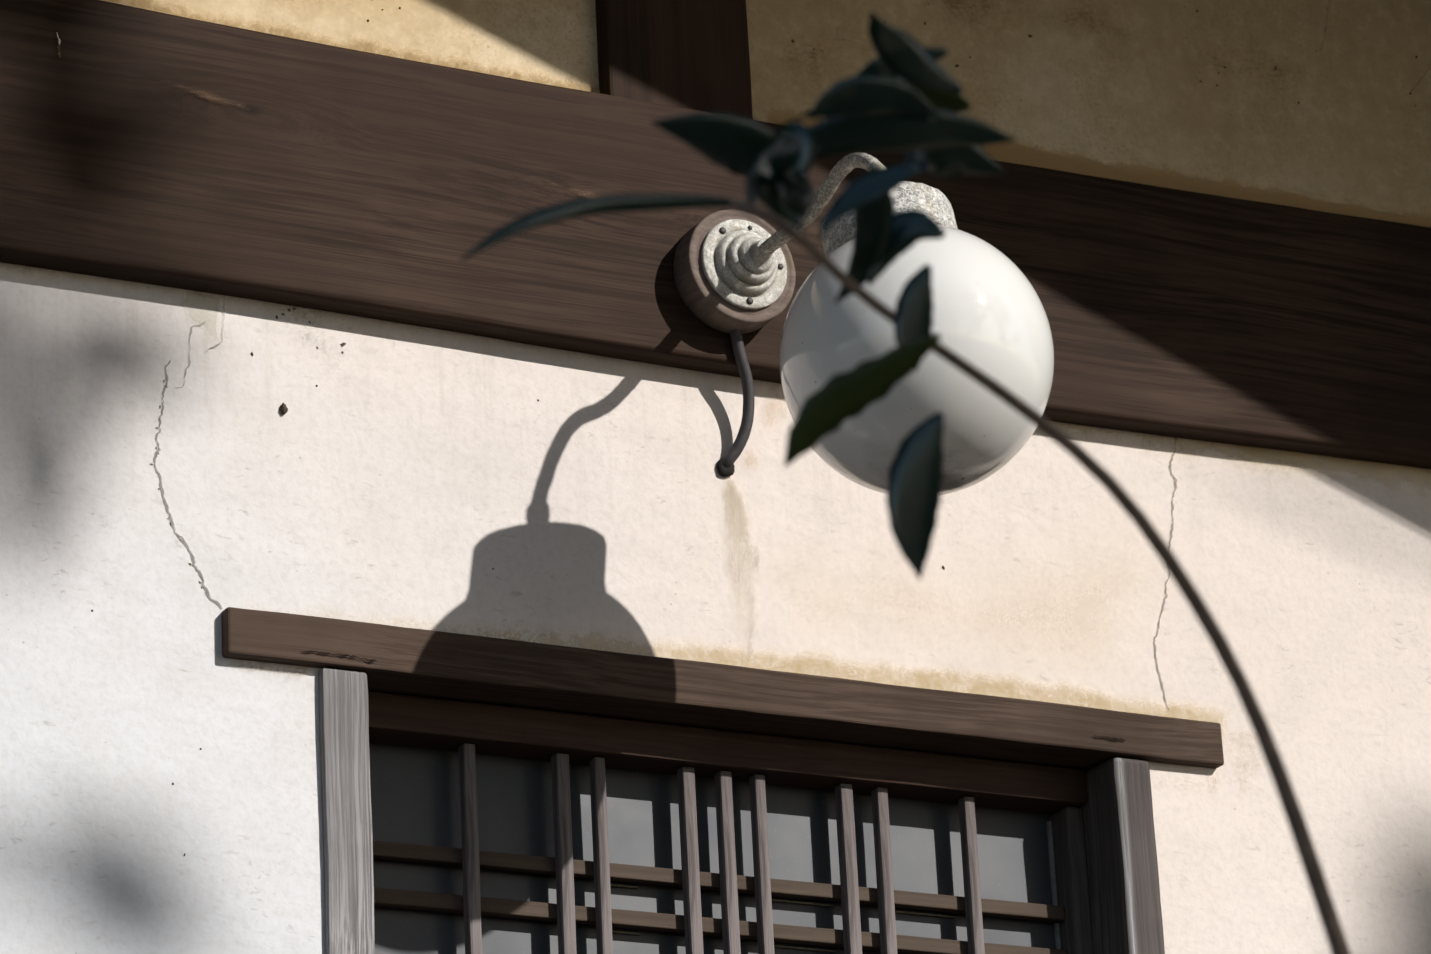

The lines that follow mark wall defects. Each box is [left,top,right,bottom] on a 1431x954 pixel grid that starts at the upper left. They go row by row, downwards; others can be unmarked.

crack [150,295,225,609]
water stain [727,481,746,539]
crack [1154,437,1177,710]